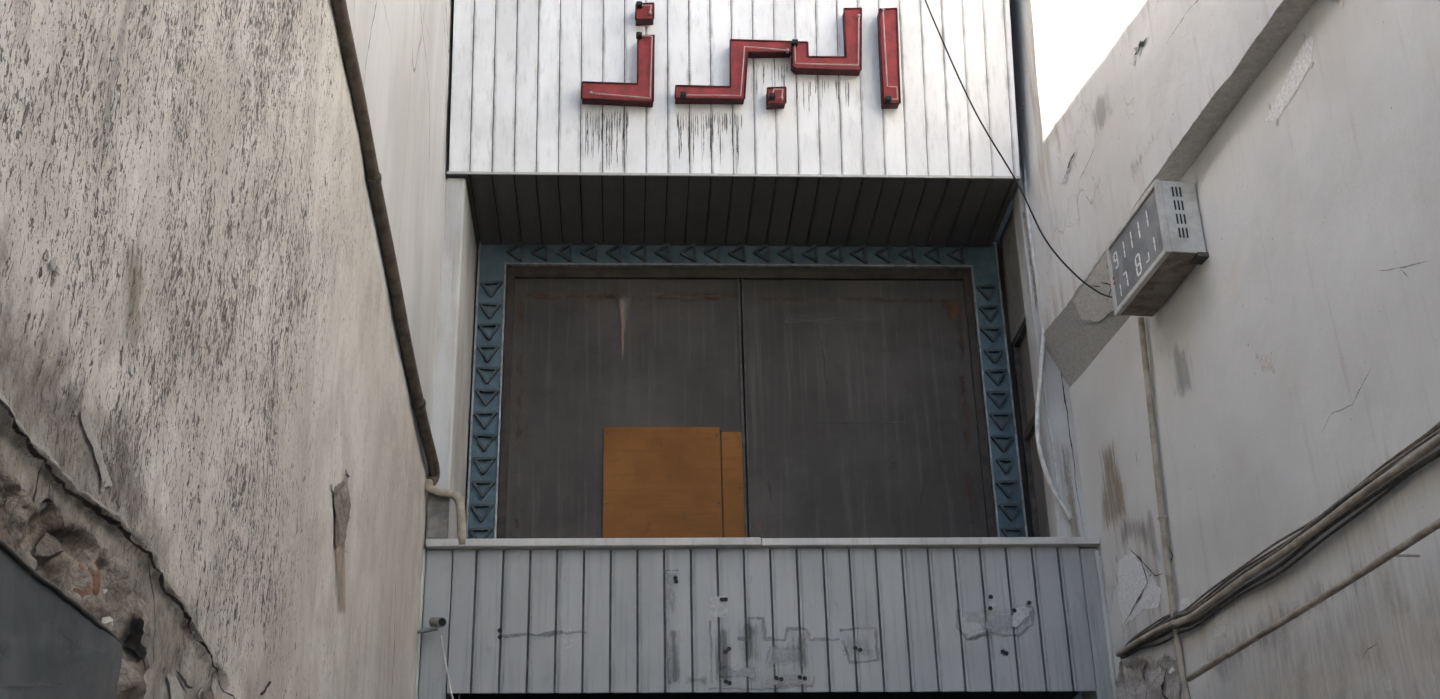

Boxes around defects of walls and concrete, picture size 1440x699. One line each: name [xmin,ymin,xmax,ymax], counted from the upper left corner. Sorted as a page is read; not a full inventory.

damp [585,109,628,169]
damp [677,112,742,163]
peeling [74,408,113,492]
spalling [0,454,217,699]
spalling [331,469,351,611]
peeling [1115,551,1194,633]
spalling [1115,654,1181,699]